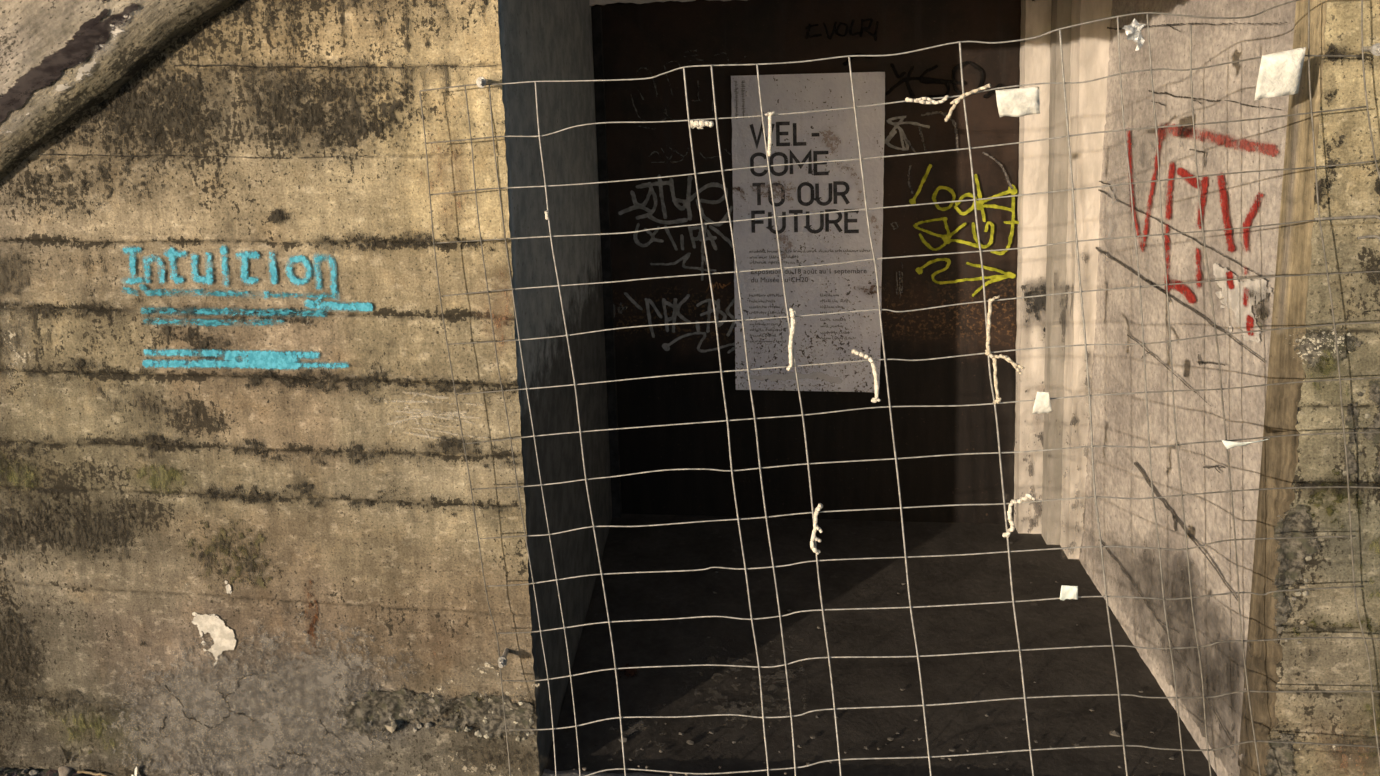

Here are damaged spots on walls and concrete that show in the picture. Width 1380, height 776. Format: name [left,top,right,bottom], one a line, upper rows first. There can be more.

damp [0,0,461,219]
damp [311,226,510,256]
damp [0,238,517,468]
damp [191,482,515,517]
damp [0,487,145,749]
crack [159,668,258,739]
damp [430,662,539,699]
crack [270,719,349,776]